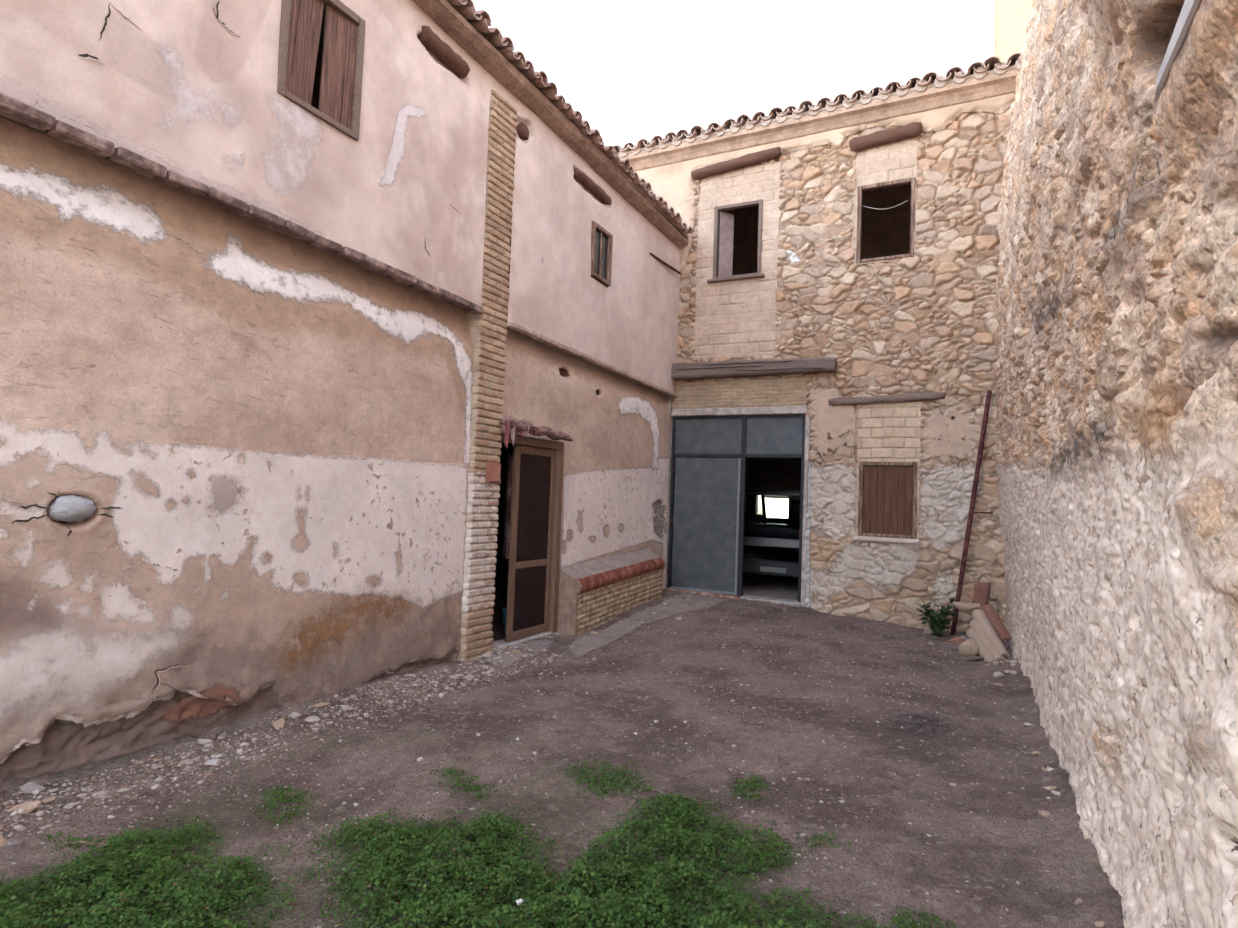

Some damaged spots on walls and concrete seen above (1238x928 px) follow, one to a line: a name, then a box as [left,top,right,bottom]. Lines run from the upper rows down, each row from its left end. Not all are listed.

crack [79,4,142,67]
crack [213,1,243,39]
peeling [0,420,468,632]
peeling [560,458,669,589]
spalling [372,648,458,680]
spalling [0,683,280,779]